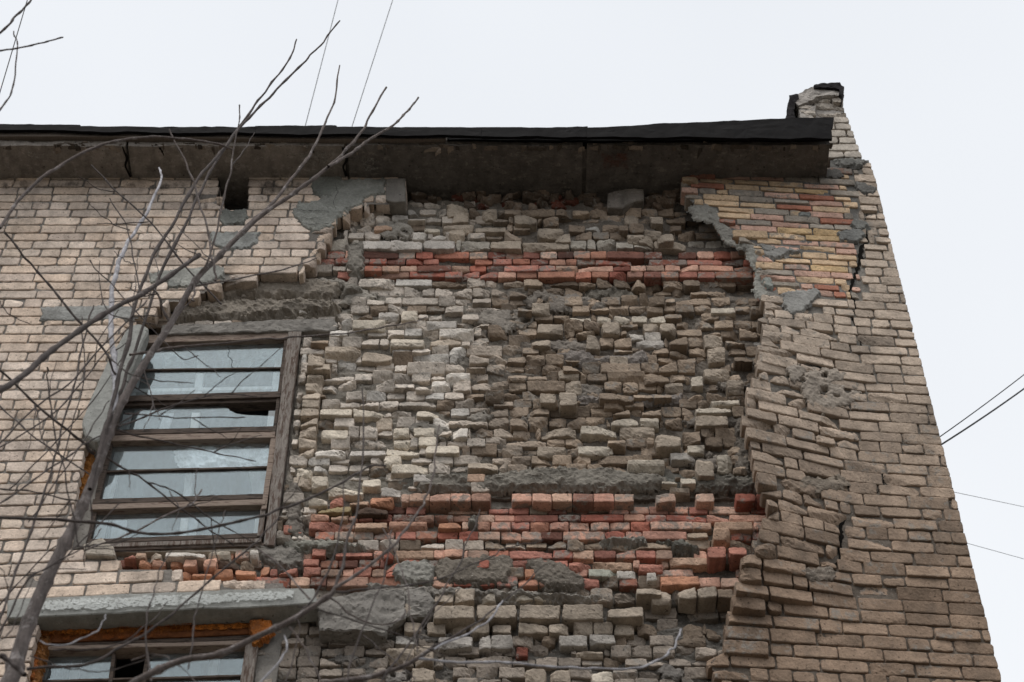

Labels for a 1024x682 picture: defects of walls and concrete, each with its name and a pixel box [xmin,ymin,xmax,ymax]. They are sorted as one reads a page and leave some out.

crack [848,215,869,346]
spalling [42,176,766,682]
crack [833,520,846,570]